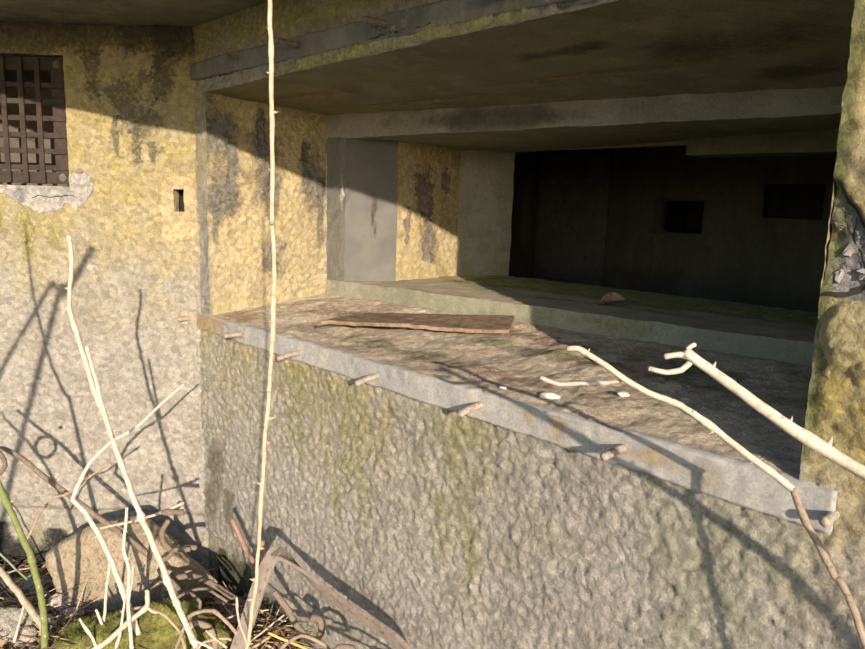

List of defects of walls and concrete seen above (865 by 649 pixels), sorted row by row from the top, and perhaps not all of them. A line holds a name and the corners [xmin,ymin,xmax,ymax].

spalling [0,172,94,214]
damp [199,95,241,251]
damp [248,110,282,220]
damp [263,242,285,275]
damp [301,142,327,279]
spalling [819,181,865,298]